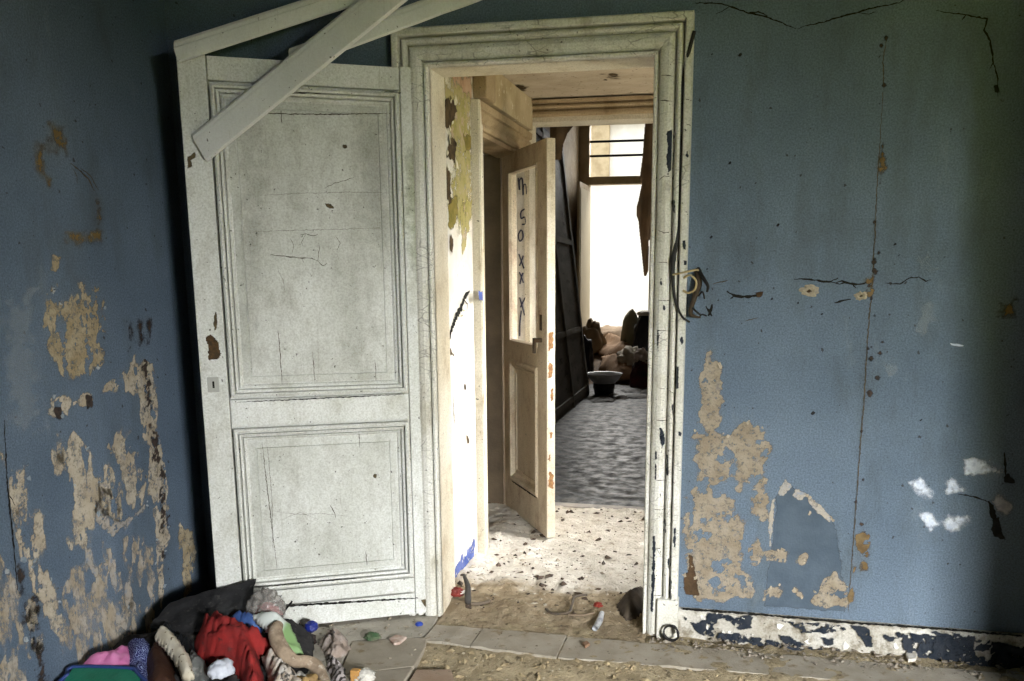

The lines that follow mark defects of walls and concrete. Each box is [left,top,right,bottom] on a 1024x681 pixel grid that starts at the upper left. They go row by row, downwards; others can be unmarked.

crack [696,0,904,29]
crack [936,10,999,94]
spalling [445,95,459,207]
peeling [43,282,106,379]
spalling [799,284,819,297]
crack [794,36,928,611]
peeling [0,355,196,681]
peeling [650,350,1024,669]